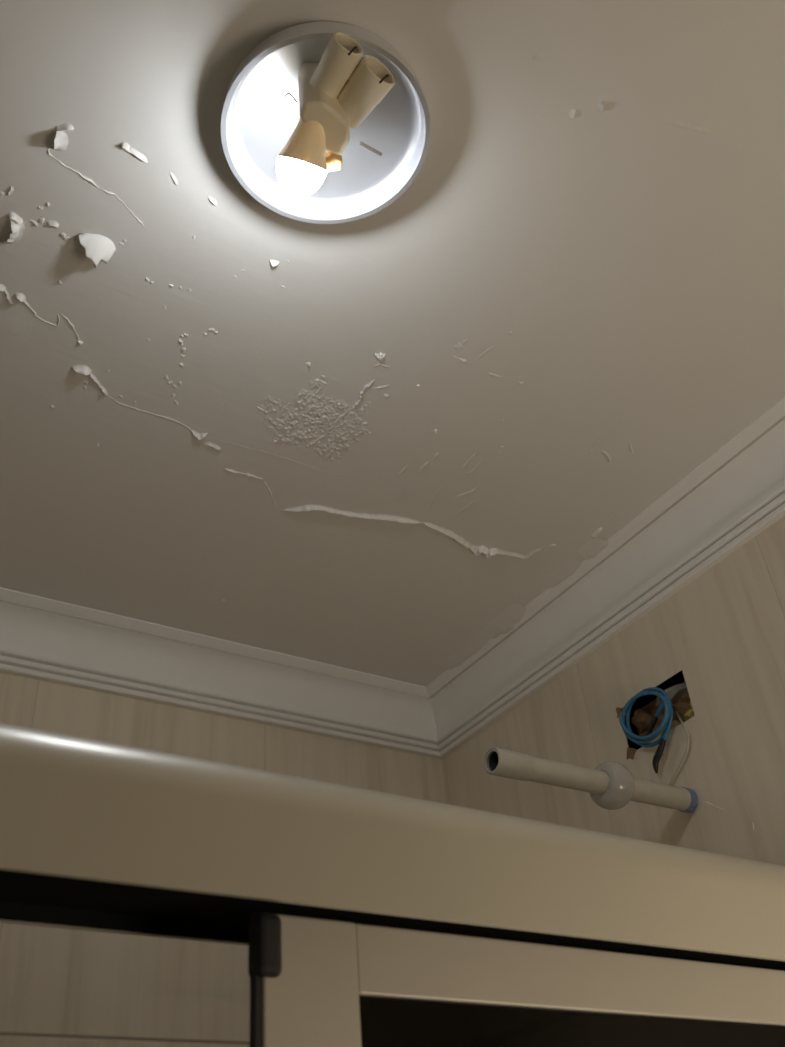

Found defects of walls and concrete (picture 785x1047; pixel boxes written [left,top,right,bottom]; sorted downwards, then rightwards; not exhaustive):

peeling [48,123,148,227]
peeling [0,202,126,268]
peeling [72,365,221,451]
peeling [255,353,390,463]